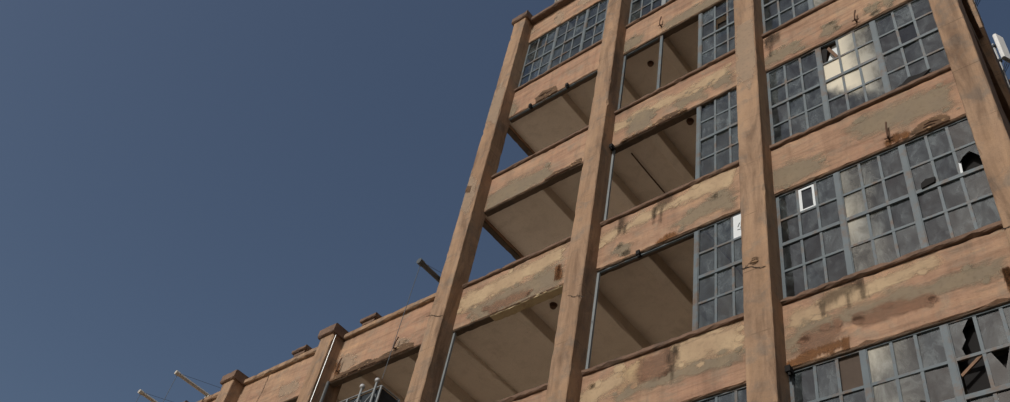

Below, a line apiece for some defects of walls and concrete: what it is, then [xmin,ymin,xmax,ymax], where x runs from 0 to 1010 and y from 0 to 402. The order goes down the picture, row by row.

spalling [910,114,950,135]
peeling [599,169,736,256]
peeling [457,248,565,322]
peeling [580,321,745,402]